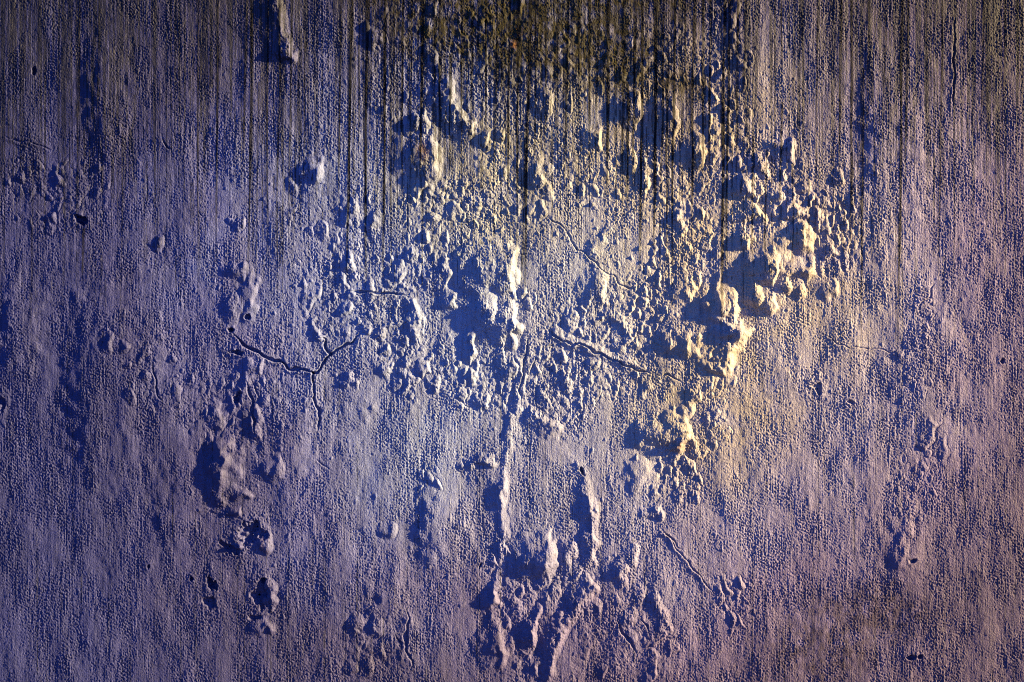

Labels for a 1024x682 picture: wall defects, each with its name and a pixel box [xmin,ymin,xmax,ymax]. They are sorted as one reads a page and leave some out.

peeling [277,0,872,444]
crack [226,324,370,444]
peeling [410,453,457,501]
crack [511,318,691,413]
peeling [640,367,751,510]
crack [654,515,724,604]